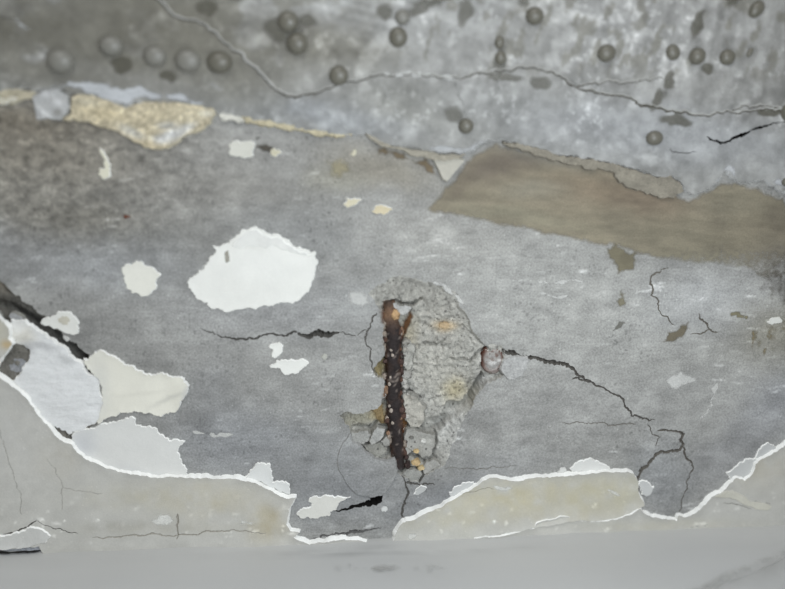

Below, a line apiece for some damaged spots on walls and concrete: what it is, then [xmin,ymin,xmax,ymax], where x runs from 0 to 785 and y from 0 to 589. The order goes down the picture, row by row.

peeling [0,0,785,195]
crack [156,0,785,153]
peeling [0,281,367,554]
peeling [187,226,318,313]
crack [201,313,377,371]
corrosion [373,299,413,470]
spalling [368,275,529,495]
peeling [392,440,785,541]
crack [502,349,694,512]
water stain [430,144,785,275]
crack [649,267,673,325]
water stain [666,325,687,341]